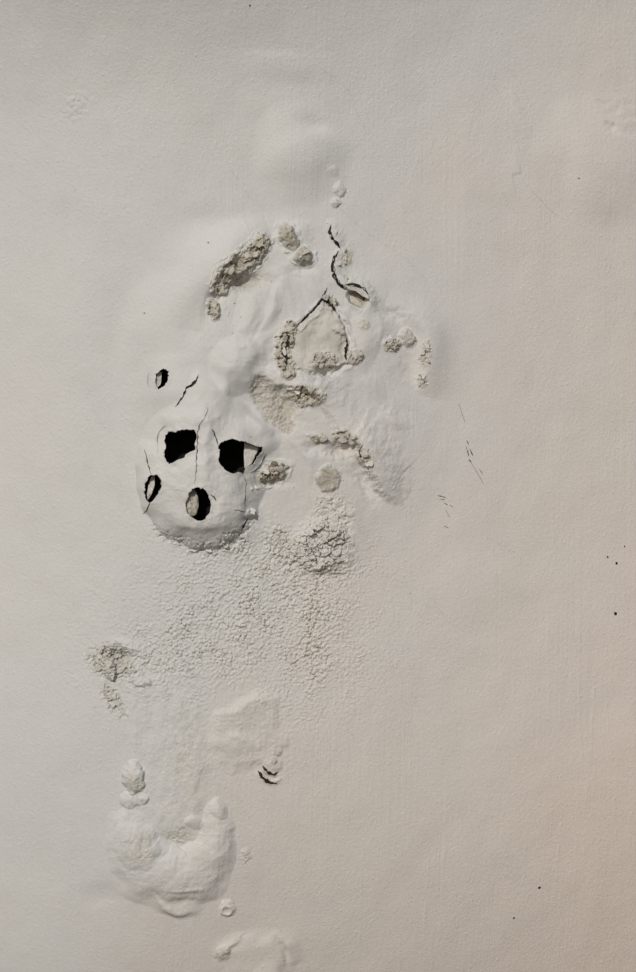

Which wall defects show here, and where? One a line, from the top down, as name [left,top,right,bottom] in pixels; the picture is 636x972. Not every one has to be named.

flaking render [186,219,318,341]
flaking render [273,162,445,410]